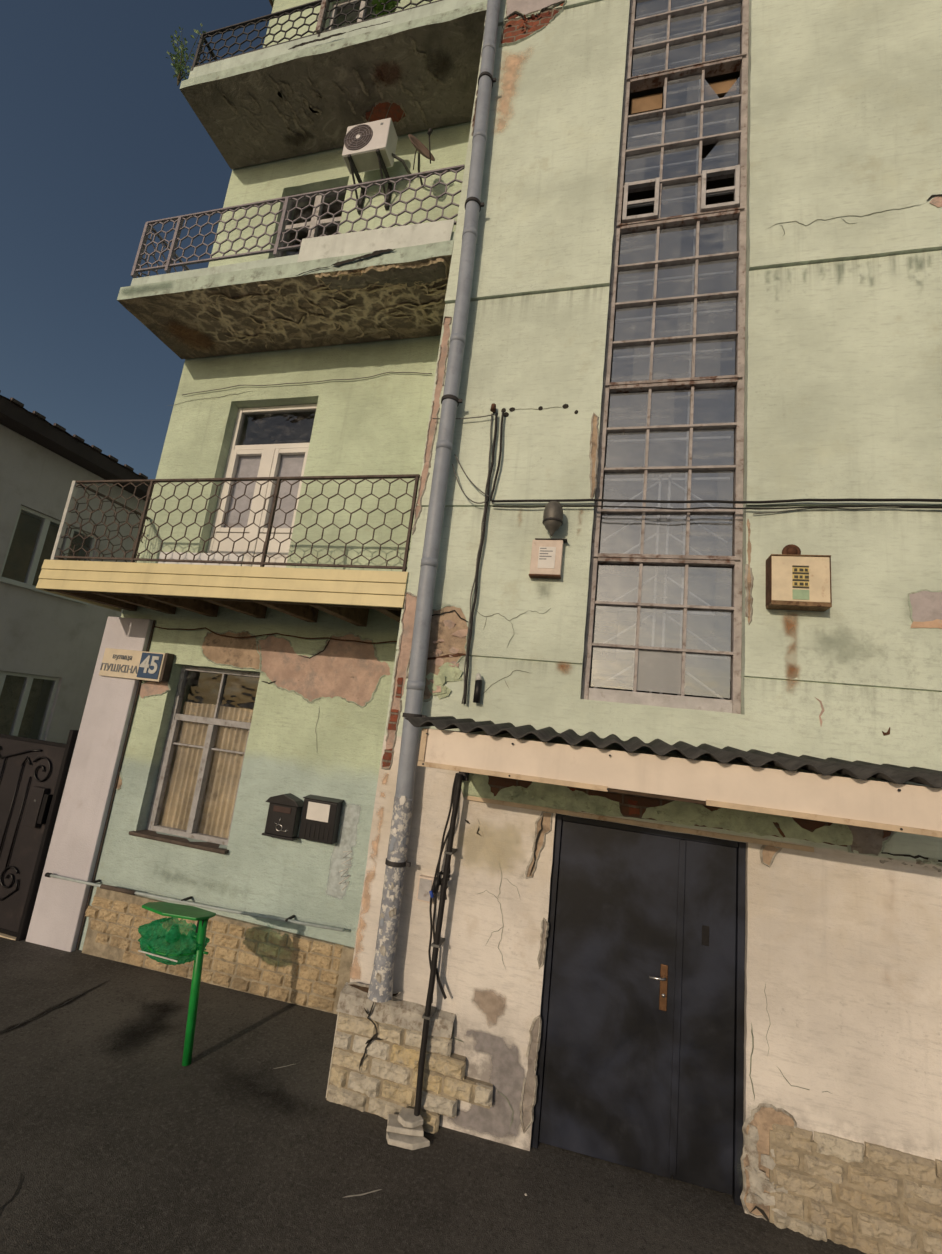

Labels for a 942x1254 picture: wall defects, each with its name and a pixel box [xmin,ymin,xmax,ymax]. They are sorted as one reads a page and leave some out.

spalling [498,0,568,129]
crack [767,194,942,234]
spalling [202,592,417,770]
spalling [423,605,470,702]
crack [476,608,551,693]
rust [785,619,795,648]
peeling [461,773,942,879]
crack [465,820,520,966]
crack [359,1002,383,1074]
peeling [474,990,505,1024]
spalling [519,1015,542,1133]
spalling [740,1103,797,1222]